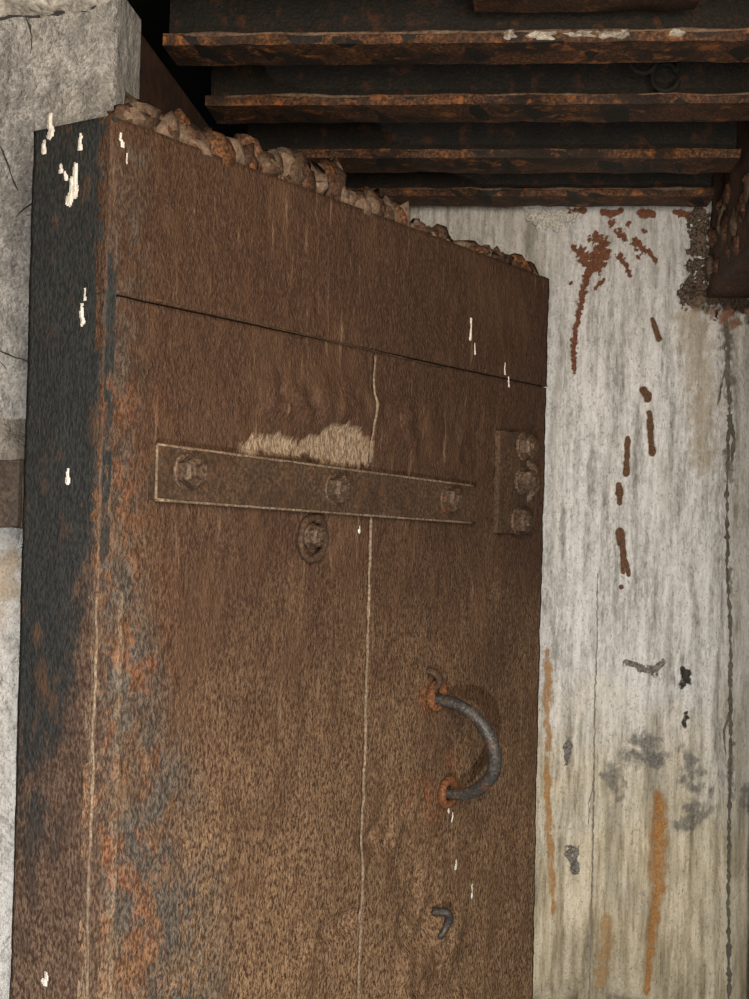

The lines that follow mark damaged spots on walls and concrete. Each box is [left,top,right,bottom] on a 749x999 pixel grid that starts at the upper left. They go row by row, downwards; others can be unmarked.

rust [107,91,539,275]
rust [672,209,692,220]
rust [708,172,749,274]
rust [569,207,658,374]
rust [650,317,662,342]
rust [639,386,656,456]
rust [615,436,631,506]
rust [615,528,631,589]
rust [543,649,555,914]
leakage [625,735,663,768]
leakage [674,754,708,830]
rust [644,792,667,994]